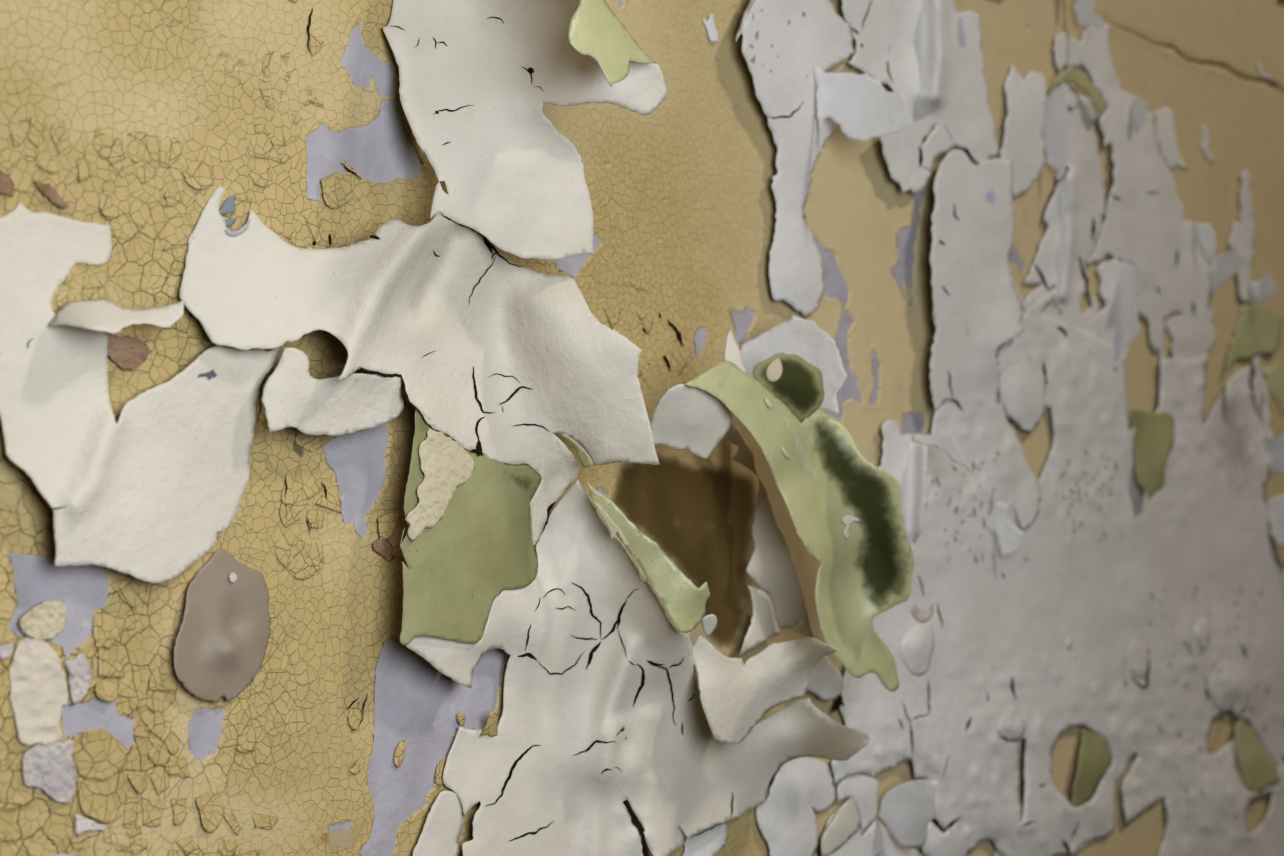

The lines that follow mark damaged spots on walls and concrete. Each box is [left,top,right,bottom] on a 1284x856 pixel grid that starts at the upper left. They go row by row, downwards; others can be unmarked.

crack [306,9,314,52]
crack [1103,18,1284,91]
crack [258,366,274,418]
peeling [0,0,999,856]
peeling [361,0,1284,856]
crack [284,475,327,531]
crack [347,697,367,732]